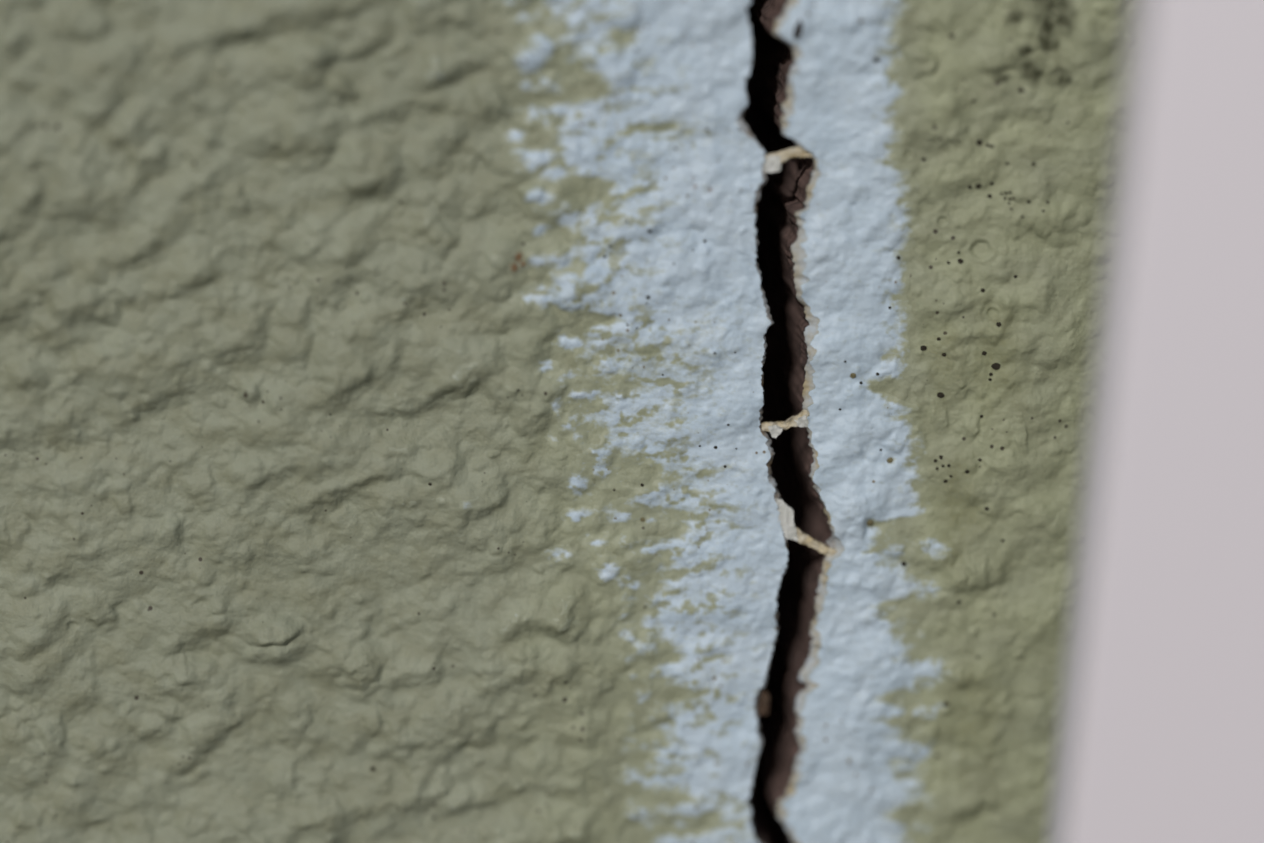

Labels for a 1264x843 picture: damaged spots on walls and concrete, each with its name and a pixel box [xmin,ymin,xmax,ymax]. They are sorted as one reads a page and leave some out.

crack [736,0,844,843]